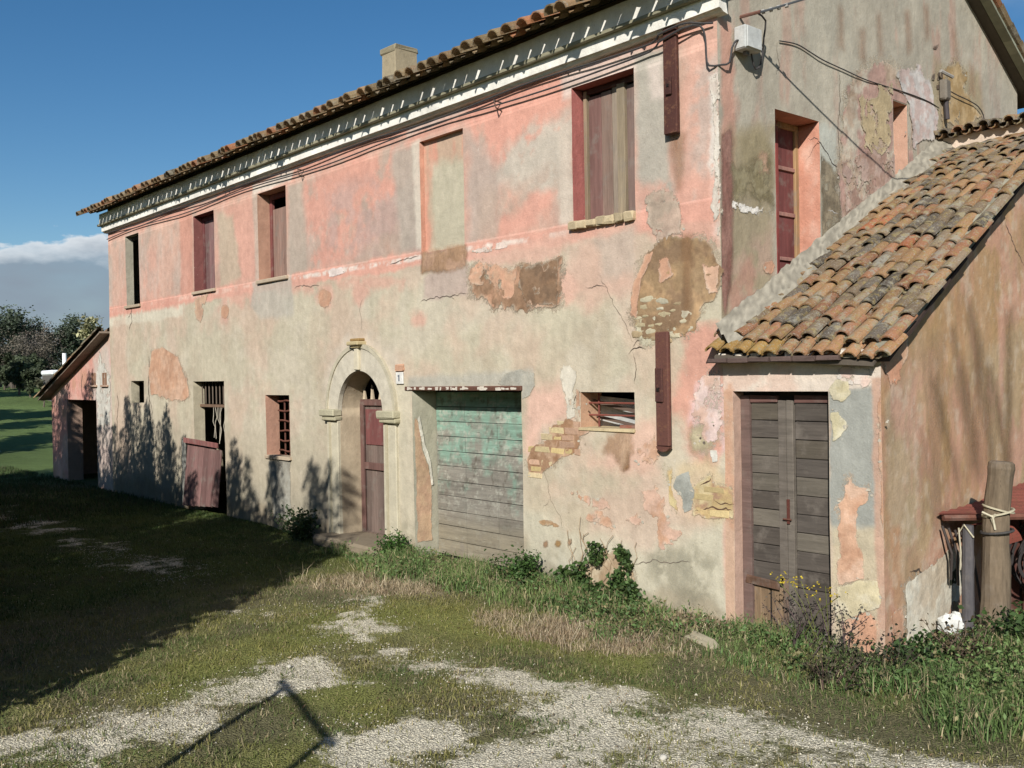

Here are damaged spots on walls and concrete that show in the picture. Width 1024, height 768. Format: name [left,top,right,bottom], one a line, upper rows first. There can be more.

flaking render [626,70,724,347]
flaking render [835,55,939,221]
flaking render [148,347,190,403]
flaking render [524,389,589,479]
crack [590,281,646,380]
flaking render [634,369,734,550]
flaking render [832,397,962,656]